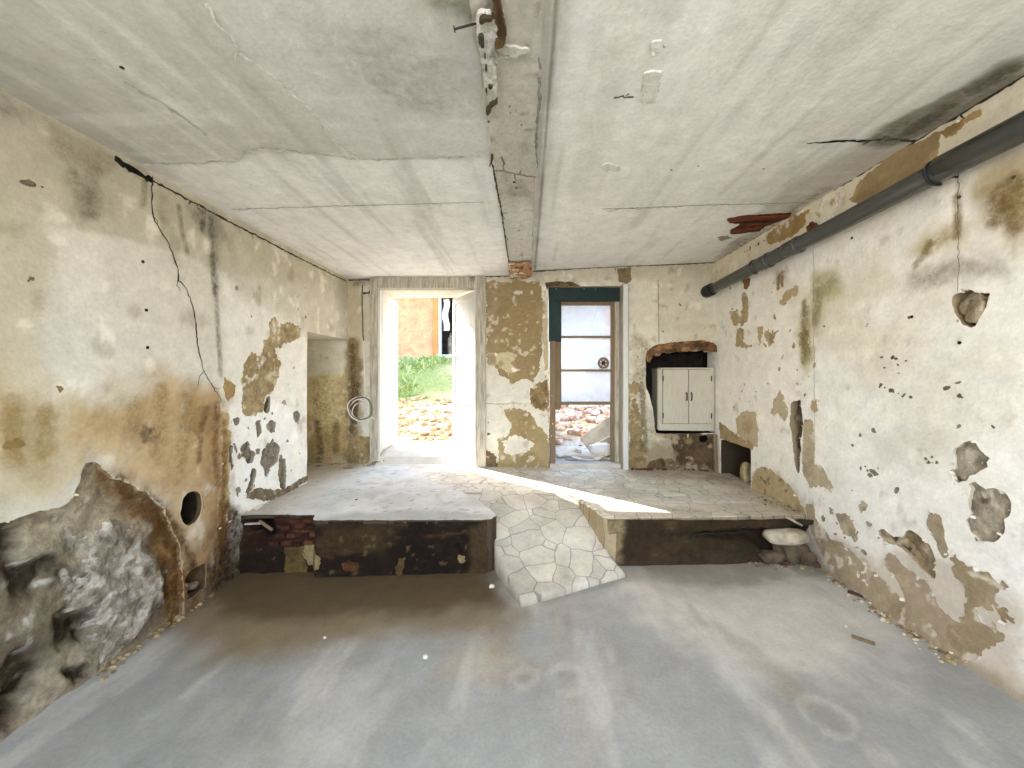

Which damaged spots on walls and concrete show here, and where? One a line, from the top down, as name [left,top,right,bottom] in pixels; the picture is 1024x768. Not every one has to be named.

crack [114,57,542,399]
flaking render [474,0,530,123]
peeling [640,70,663,104]
peeling [744,109,982,252]
crack [807,75,1024,191]
leakage [875,66,1019,144]
leakage [991,181,1024,231]
peeling [217,308,308,532]
leakage [313,343,361,463]
peeling [486,262,580,468]
peeling [729,274,1015,664]
flaking render [0,462,179,743]